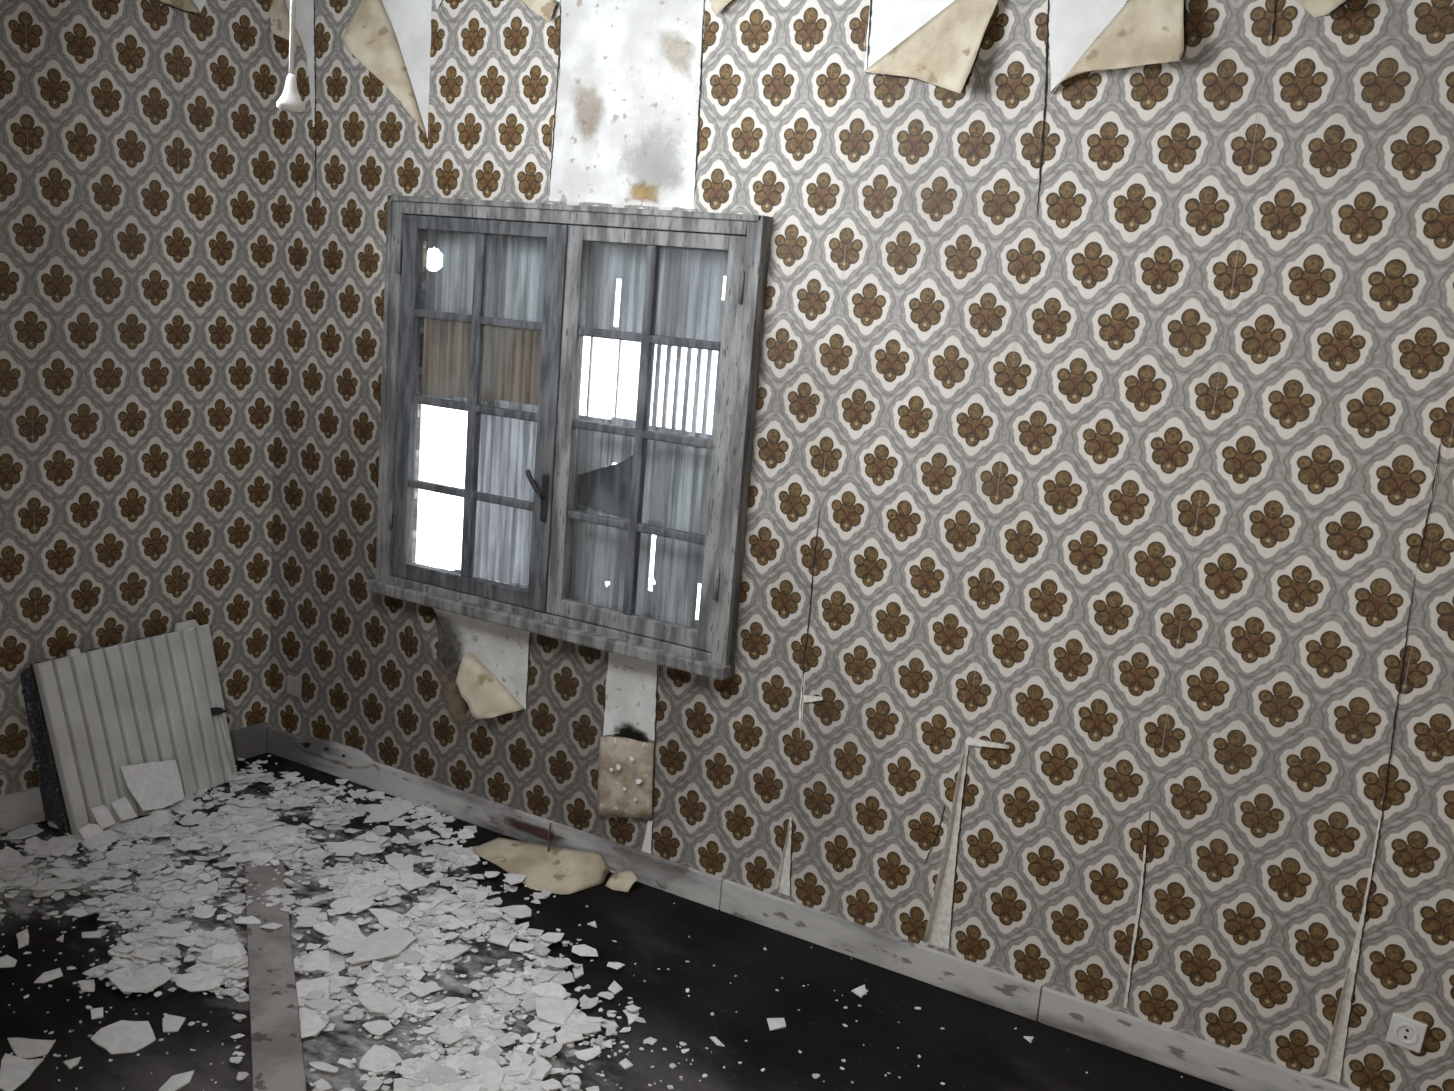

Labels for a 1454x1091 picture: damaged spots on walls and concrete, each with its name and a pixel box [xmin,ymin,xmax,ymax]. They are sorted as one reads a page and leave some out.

flaking render [285,0,315,127]
flaking render [382,0,442,139]
water stain [577,92,599,134]
flaking render [549,0,712,209]
flaking render [864,0,955,74]
flaking render [1048,0,1128,97]
flaking render [433,608,530,710]
flaking render [597,652,659,854]
flaking render [777,817,792,896]
flaking render [926,736,970,950]